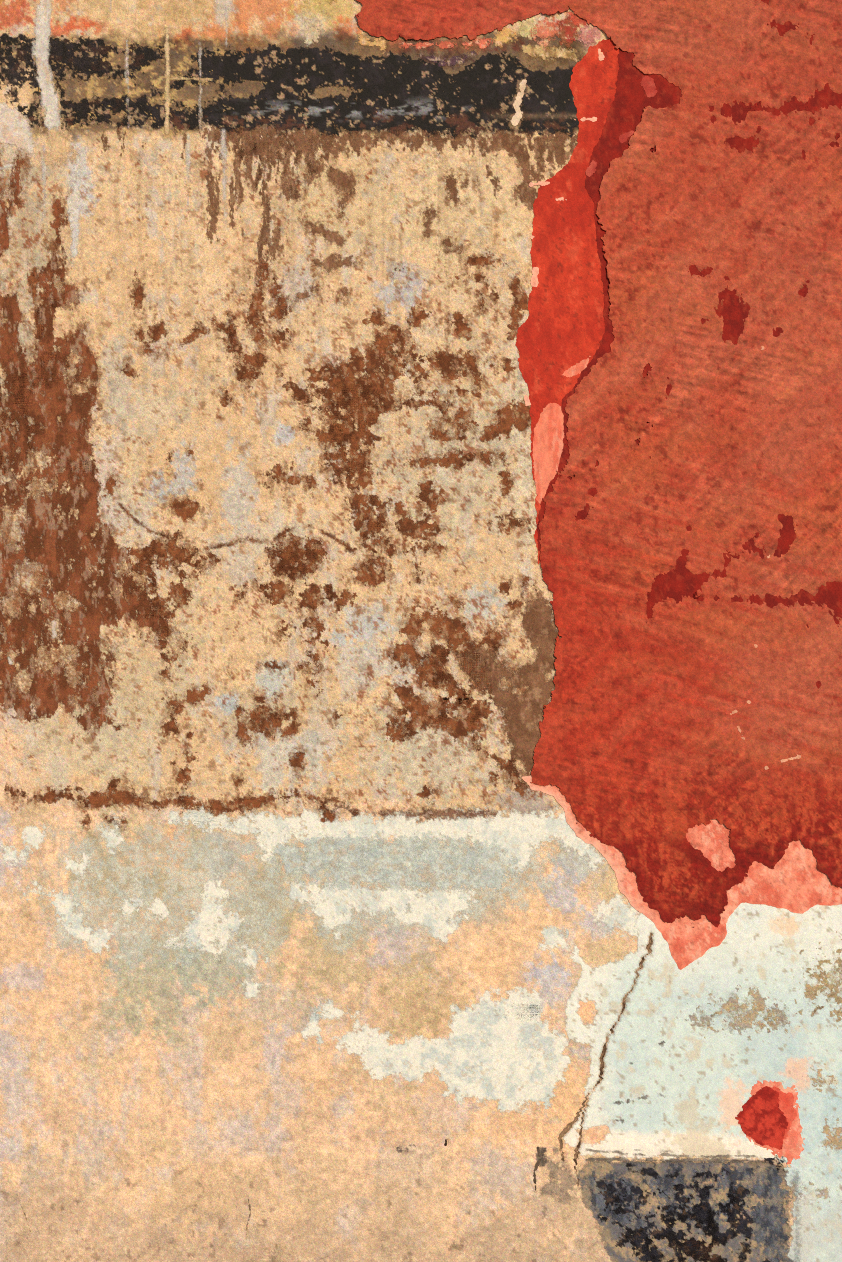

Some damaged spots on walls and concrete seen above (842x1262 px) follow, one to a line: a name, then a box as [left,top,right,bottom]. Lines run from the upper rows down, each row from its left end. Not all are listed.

corrosion [0,151,30,257]
peeling [358,14,683,564]
peeling [686,265,750,345]
peeling [709,83,842,153]
corrosion [0,194,501,830]
corrosion [180,155,532,697]
peeling [646,514,842,627]
corrosion [375,576,561,798]
peeling [686,819,736,872]
crack [533,933,653,1191]
peeling [686,931,842,1040]
flaking render [576,1080,842,1262]